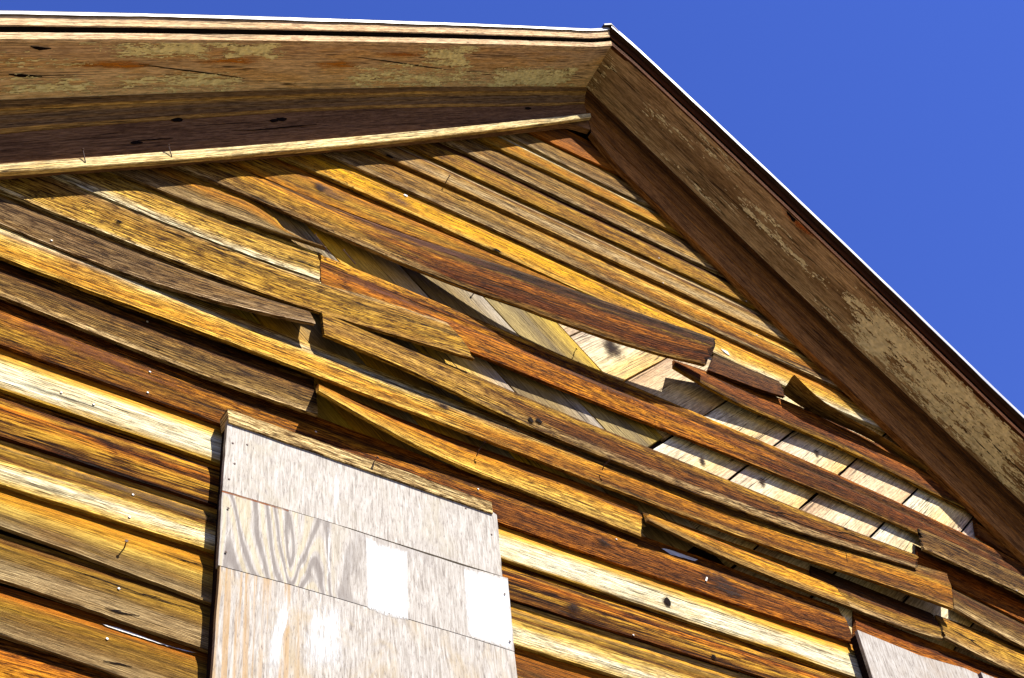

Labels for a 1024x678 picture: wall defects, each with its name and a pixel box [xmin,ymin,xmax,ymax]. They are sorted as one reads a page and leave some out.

peeling [642,102,829,287]
peeling [800,287,1024,502]